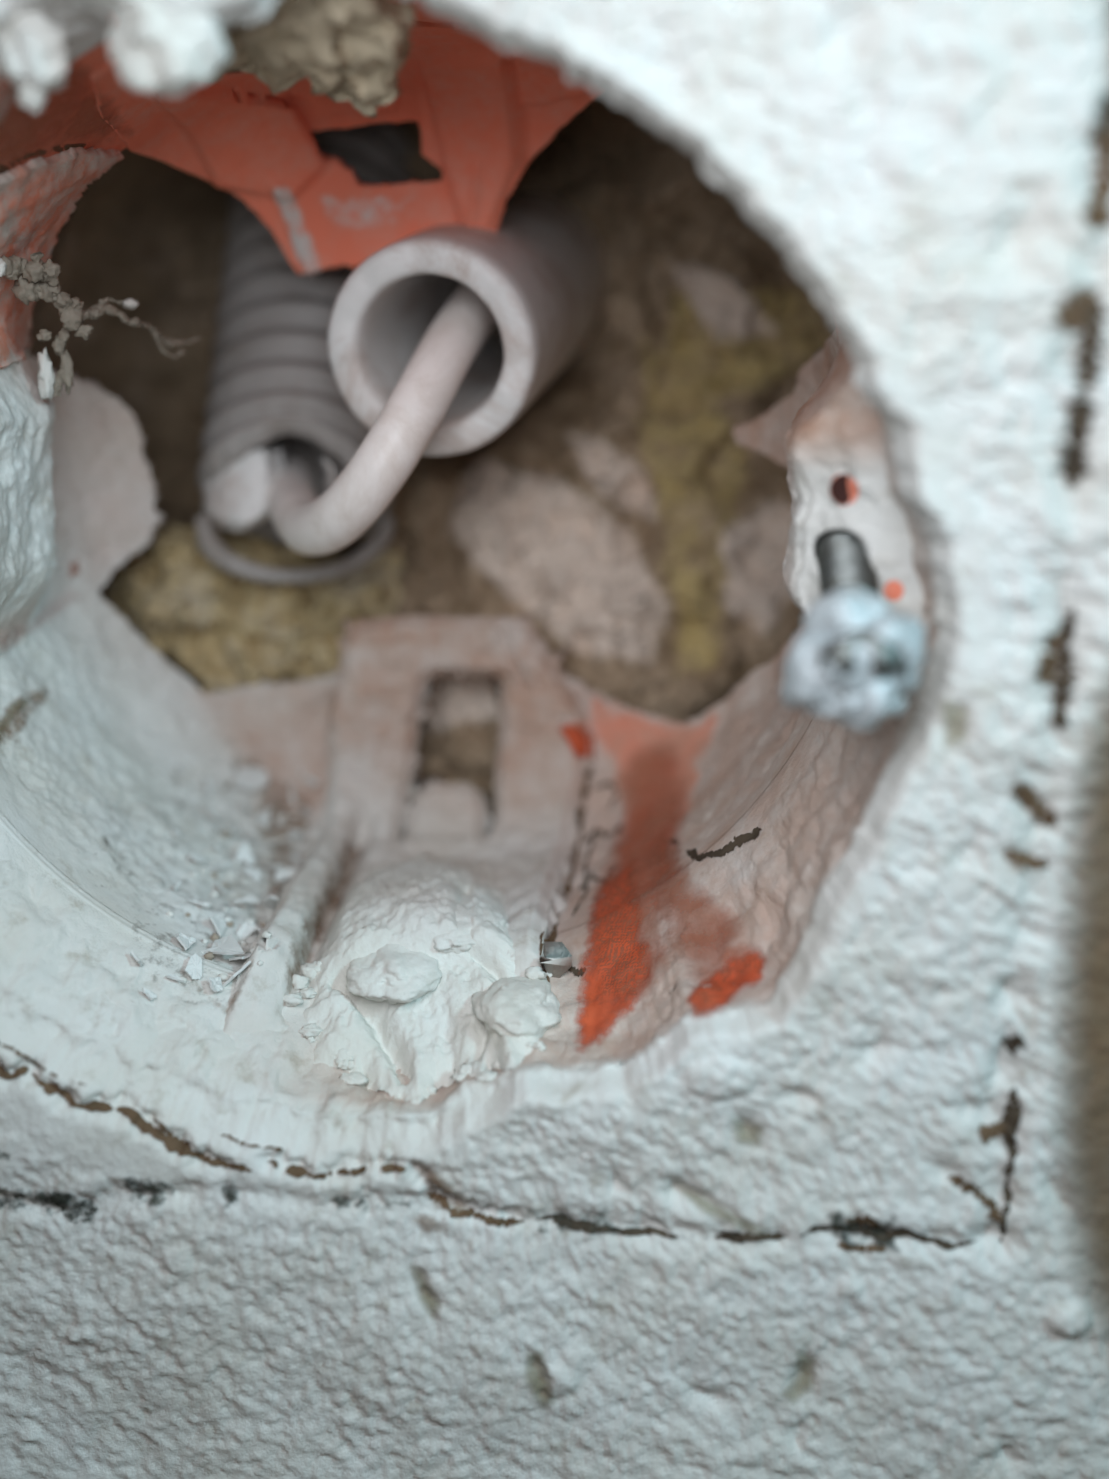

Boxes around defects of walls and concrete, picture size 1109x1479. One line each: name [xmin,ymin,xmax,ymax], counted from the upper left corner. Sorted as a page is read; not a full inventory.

spalling [395,121,442,182]
spalling [511,95,677,271]
spalling [0,69,287,547]
crack [0,1030,1028,1253]